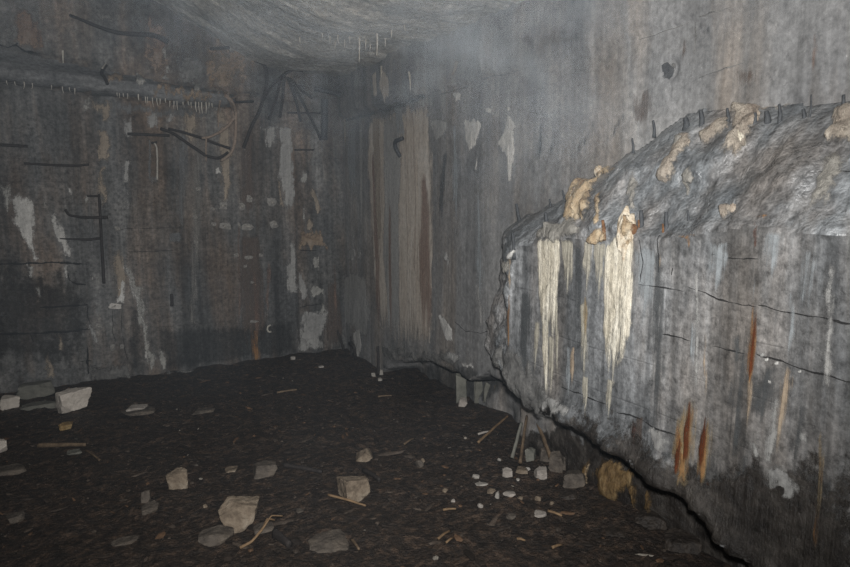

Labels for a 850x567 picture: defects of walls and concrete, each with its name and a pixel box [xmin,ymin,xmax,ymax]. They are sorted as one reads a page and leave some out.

peeling [260,126,314,207]
leakage [343,66,459,343]
peeling [498,106,516,181]
leakage [0,187,84,360]
peeling [287,189,328,351]
leakage [521,293,574,391]
crack [562,387,677,436]
leakage [637,249,664,398]
rust [674,402,709,478]
crack [639,235,850,325]
rust [747,323,756,416]
crack [715,346,850,382]